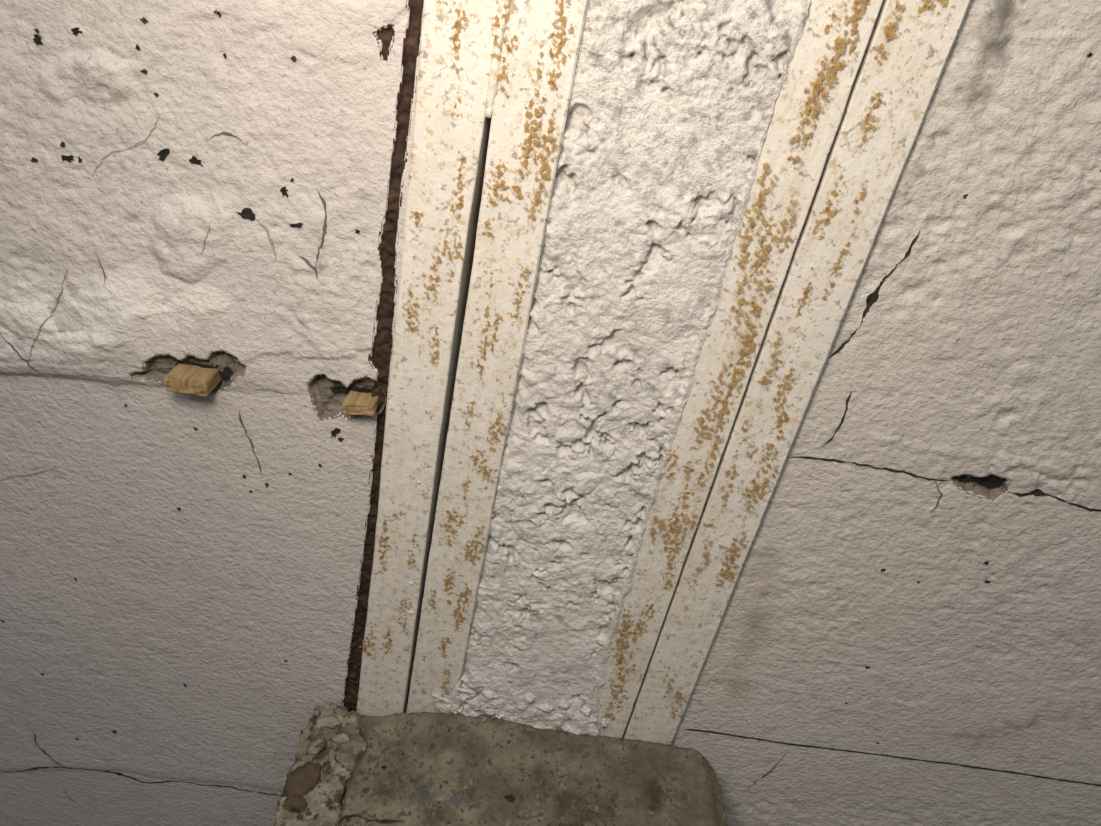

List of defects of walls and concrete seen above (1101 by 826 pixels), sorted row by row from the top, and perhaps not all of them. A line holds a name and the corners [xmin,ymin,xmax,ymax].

corrosion [872,0,948,72]
corrosion [482,0,576,242]
crack [829,231,920,358]
spalling [128,350,245,394]
spalling [307,374,387,442]
corrosion [341,0,475,712]
corrosion [440,403,508,567]
corrosion [599,0,871,731]
crack [789,391,950,512]
spalling [950,474,1011,501]
crack [1011,489,1101,512]
crack [686,729,1101,792]